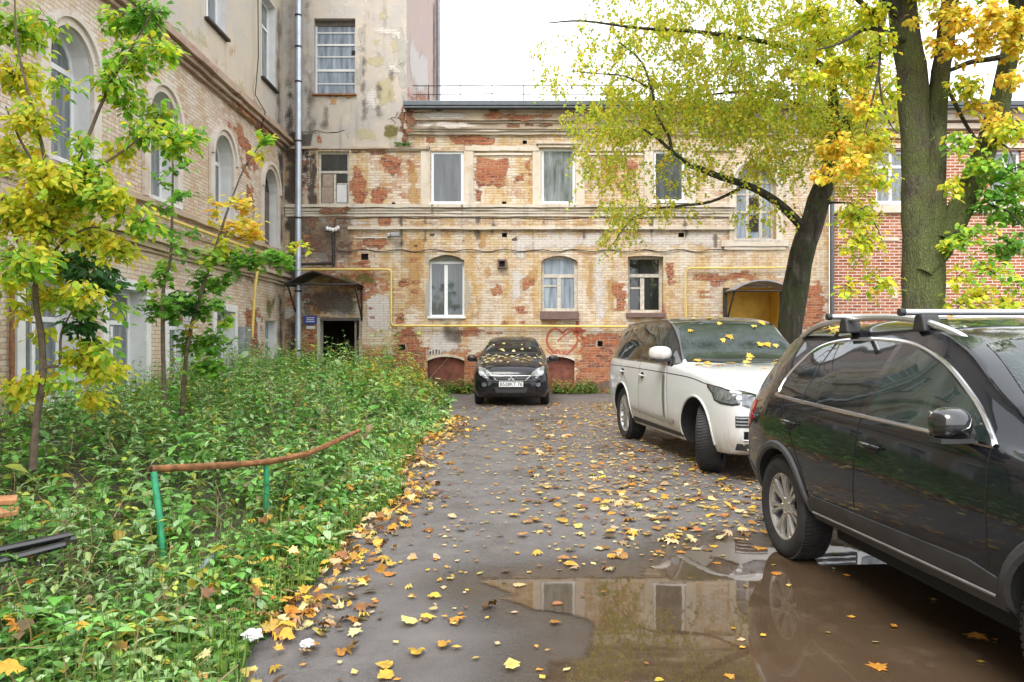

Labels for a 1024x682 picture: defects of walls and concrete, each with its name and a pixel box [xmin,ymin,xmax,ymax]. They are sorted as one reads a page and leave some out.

water stain [363,60,381,116]
spalling [228,99,272,215]
peeling [375,76,533,201]
peeling [302,128,414,252]
peeling [397,278,420,294]
peeling [611,281,627,311]
peeling [665,262,676,284]
peeling [693,270,758,298]
peeling [802,279,829,330]
spalling [331,283,431,385]
spalling [576,329,625,393]